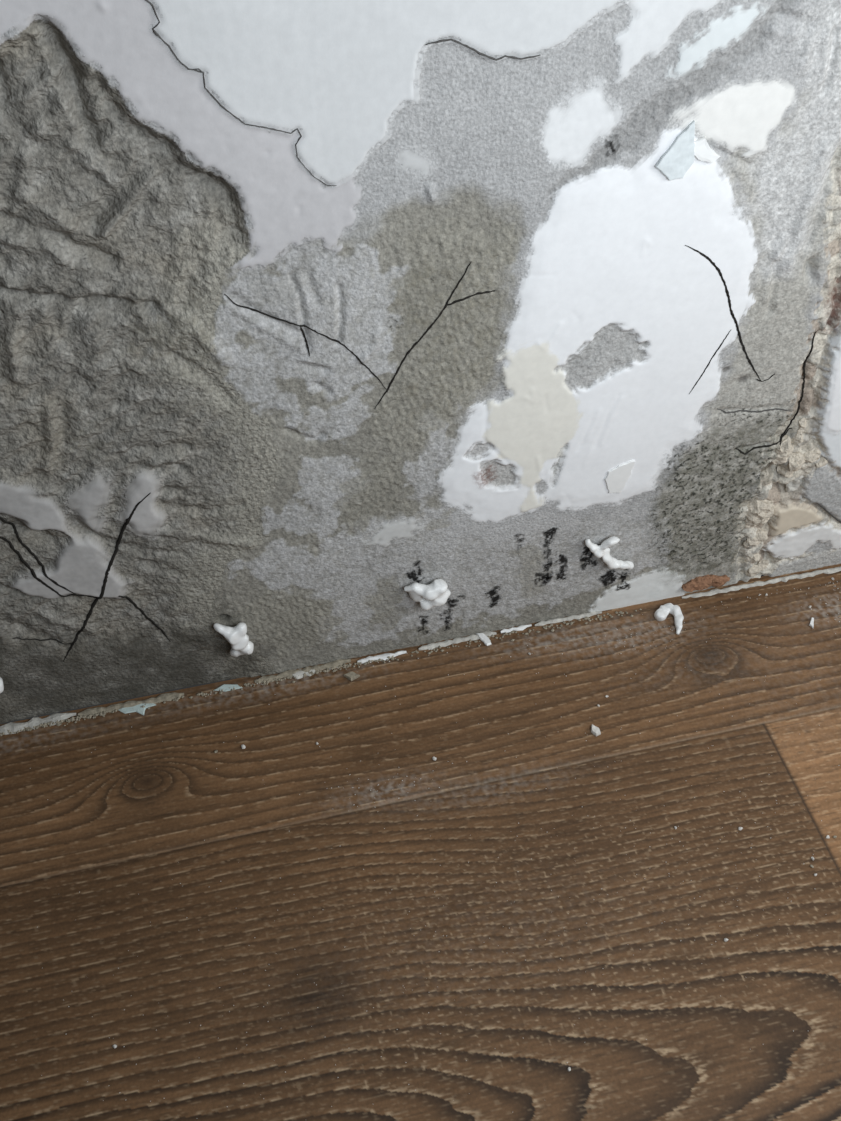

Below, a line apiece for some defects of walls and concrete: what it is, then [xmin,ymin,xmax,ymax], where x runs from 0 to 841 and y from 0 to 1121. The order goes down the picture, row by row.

crack [225,262,495,408]
peeling [0,0,841,723]
crack [685,245,775,394]
crack [719,331,816,455]
crack [0,493,171,662]